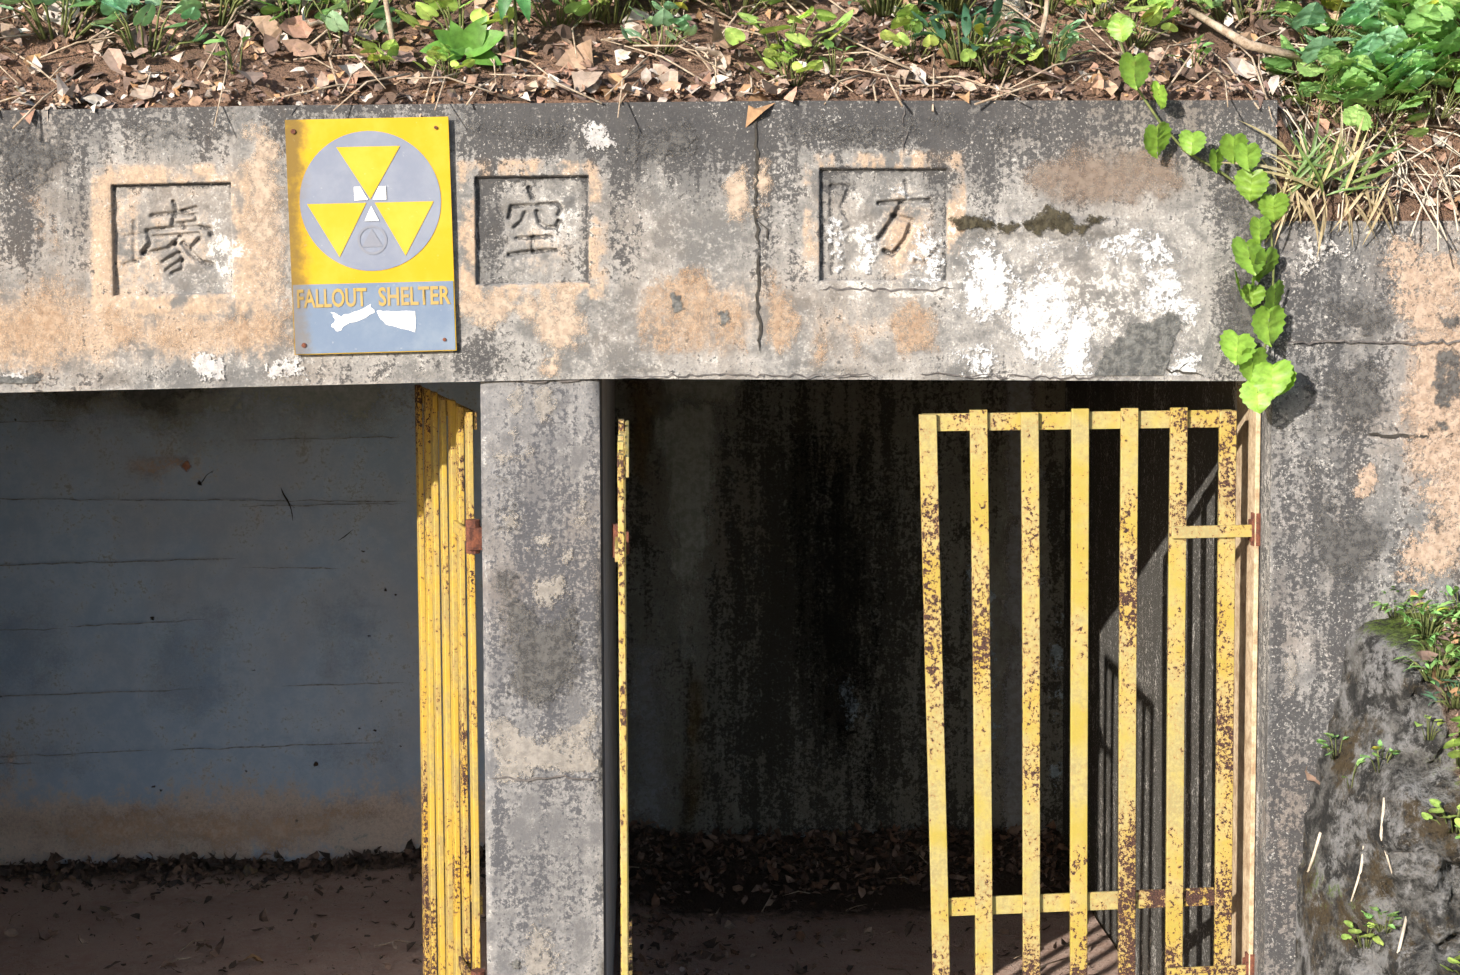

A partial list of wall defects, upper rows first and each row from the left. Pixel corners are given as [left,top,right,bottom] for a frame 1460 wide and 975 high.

leakage [24,384,380,422]
crack [522,117,879,383]
crack [821,285,952,293]
crack [922,372,1099,380]
leakage [655,379,754,659]
leakage [775,416,902,810]
crack [490,774,599,782]
leakage [627,642,672,829]